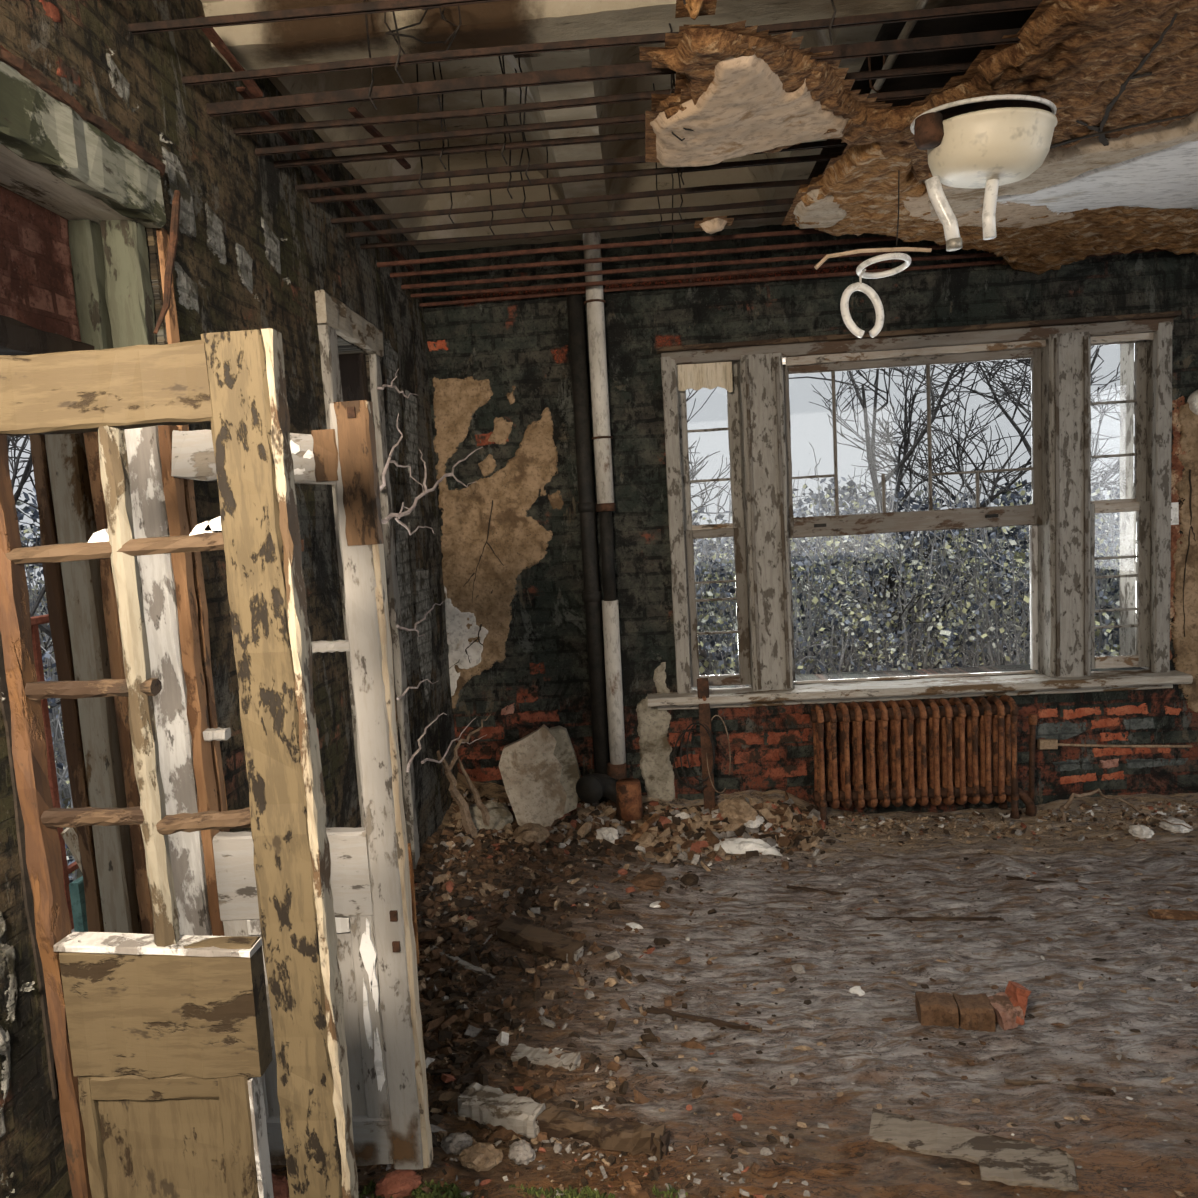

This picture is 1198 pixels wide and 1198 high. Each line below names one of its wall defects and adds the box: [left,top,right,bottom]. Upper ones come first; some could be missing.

water stain [260,0,389,59]
water stain [407,0,535,58]
corrosion [455,287,586,306]
corrosion [603,264,879,289]
peeling [385,339,563,709]
spalling [454,692,560,782]
spalling [729,713,810,780]
peeling [0,911,35,1137]